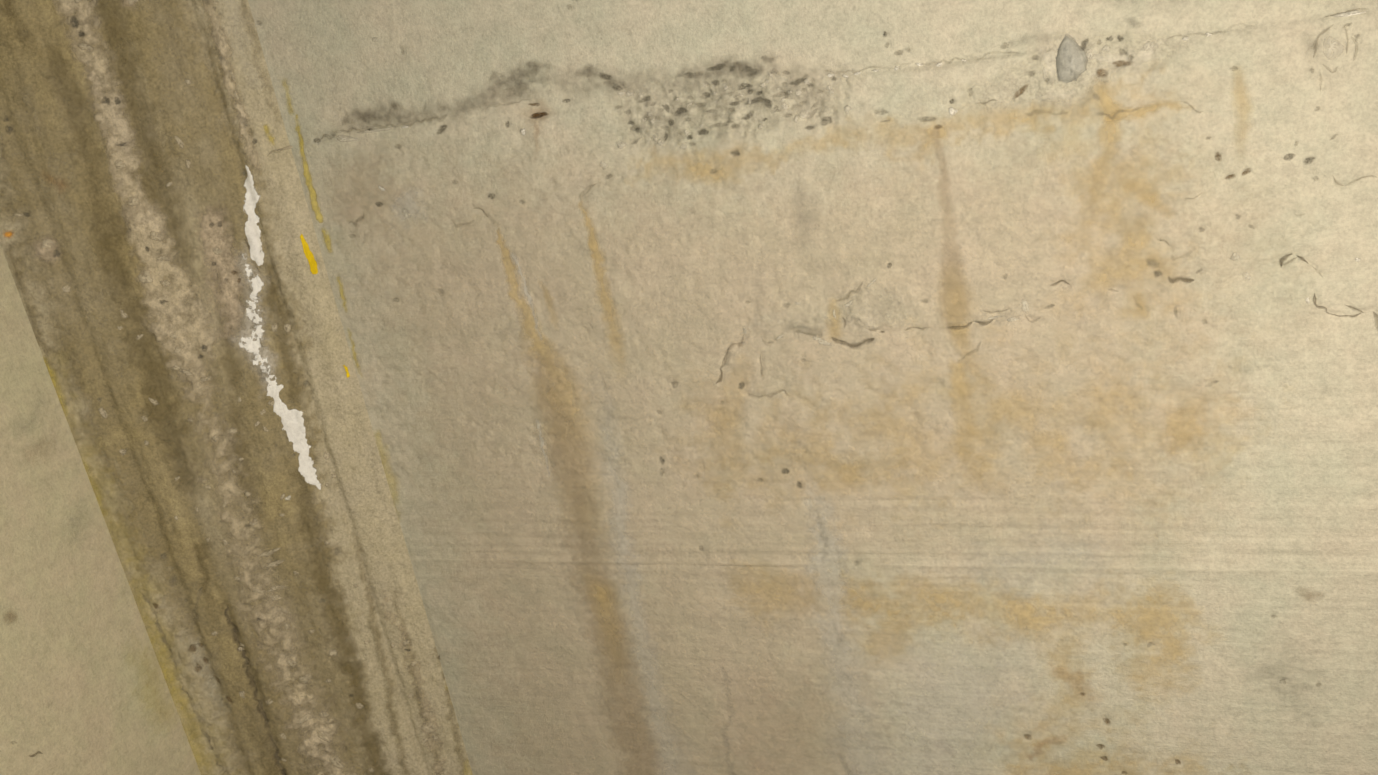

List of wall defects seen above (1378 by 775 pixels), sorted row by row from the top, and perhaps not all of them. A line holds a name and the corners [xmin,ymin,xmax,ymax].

spalling [36,239,60,260]
damp [0,0,386,775]
spalling [55,0,374,775]